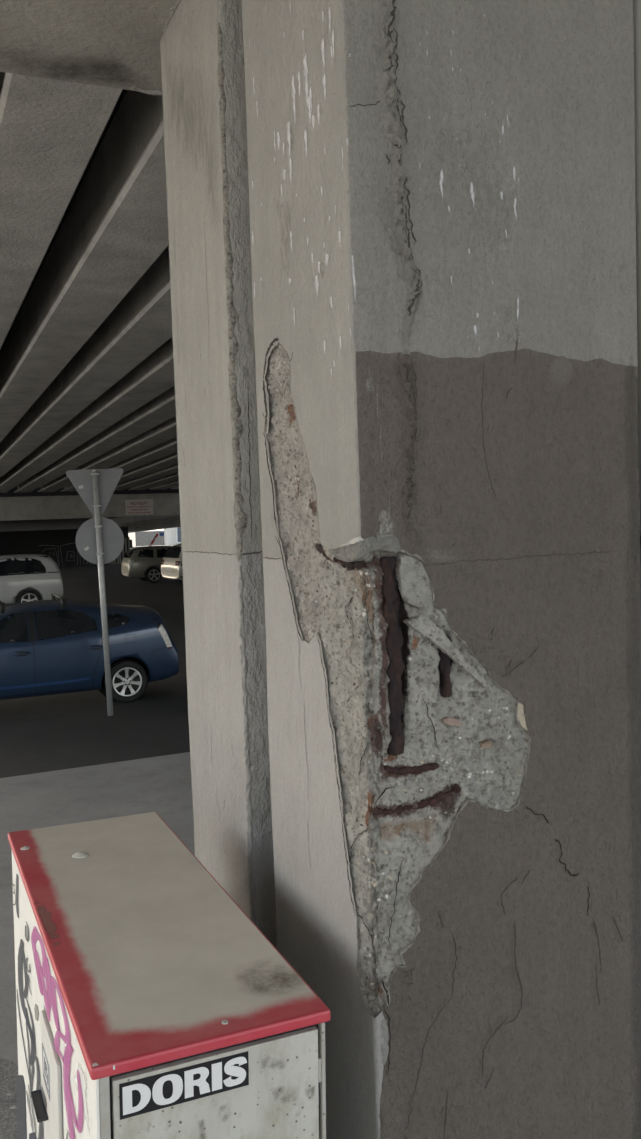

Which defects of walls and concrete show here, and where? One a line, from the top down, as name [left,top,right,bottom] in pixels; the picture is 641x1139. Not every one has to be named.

crack [183,334,309,793]
rust [317,544,429,779]
spalling [264,341,531,1076]
rust [364,784,459,831]
rust [437,634,453,698]
crack [526,807,590,917]
crack [404,913,458,1139]